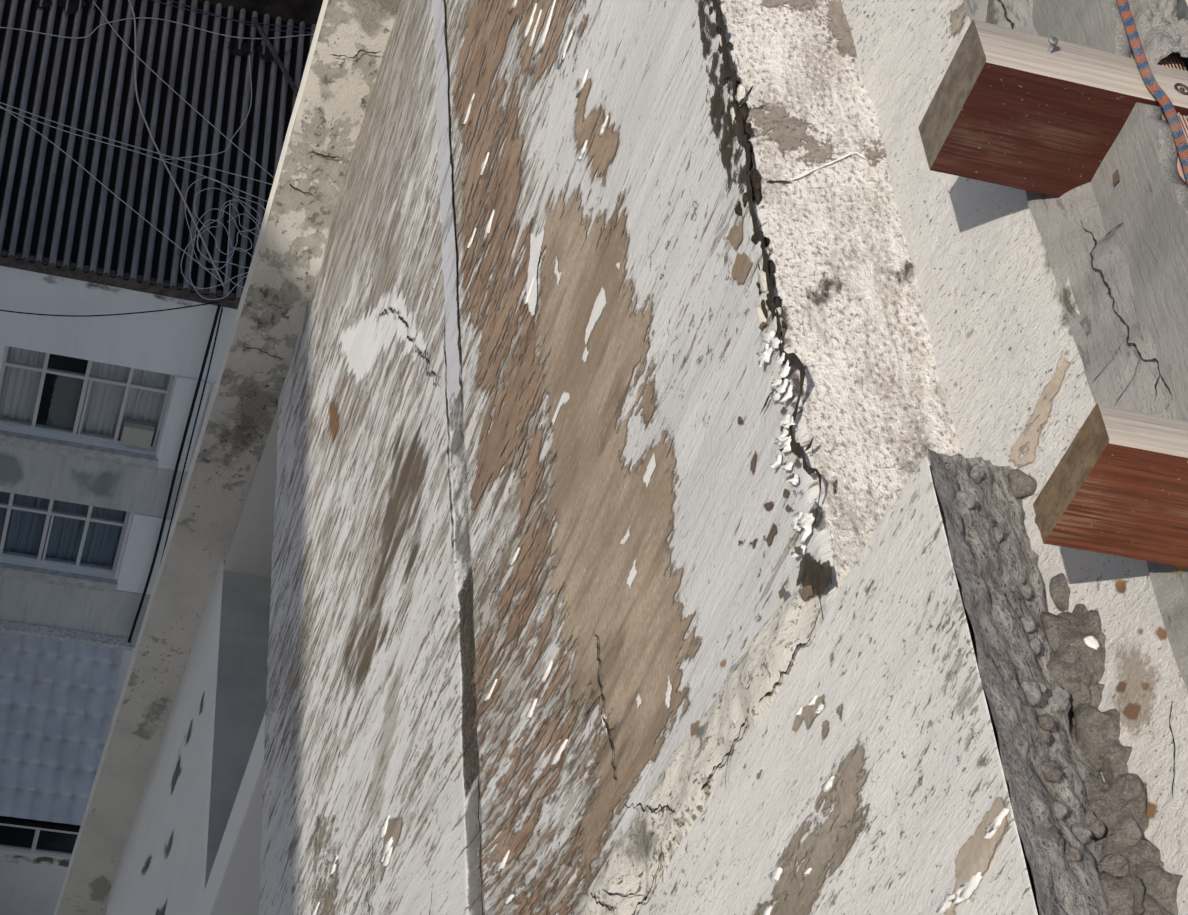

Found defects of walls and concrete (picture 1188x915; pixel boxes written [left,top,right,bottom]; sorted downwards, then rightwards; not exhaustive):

peeling [760,0,857,61]
crack [998,0,1014,29]
peeling [858,138,887,166]
crack [376,1,463,568]
spalling [695,0,837,601]
crack [1080,220,1172,410]
peeling [452,0,702,915]
crack [585,635,681,915]
crack [701,602,826,790]
peeling [754,732,874,915]
peeling [936,797,1009,915]
peeling [1083,636,1100,650]